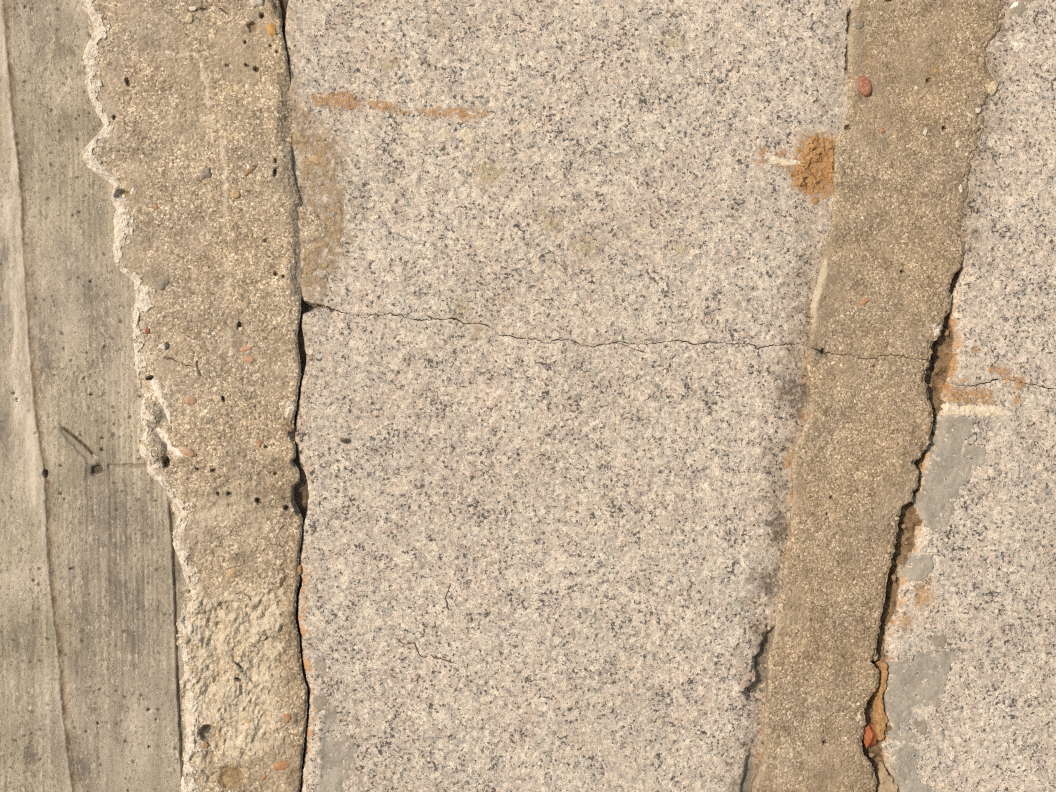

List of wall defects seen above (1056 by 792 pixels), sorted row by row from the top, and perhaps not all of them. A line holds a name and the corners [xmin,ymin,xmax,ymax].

spalling [81,0,286,792]
crack [301,300,1054,389]